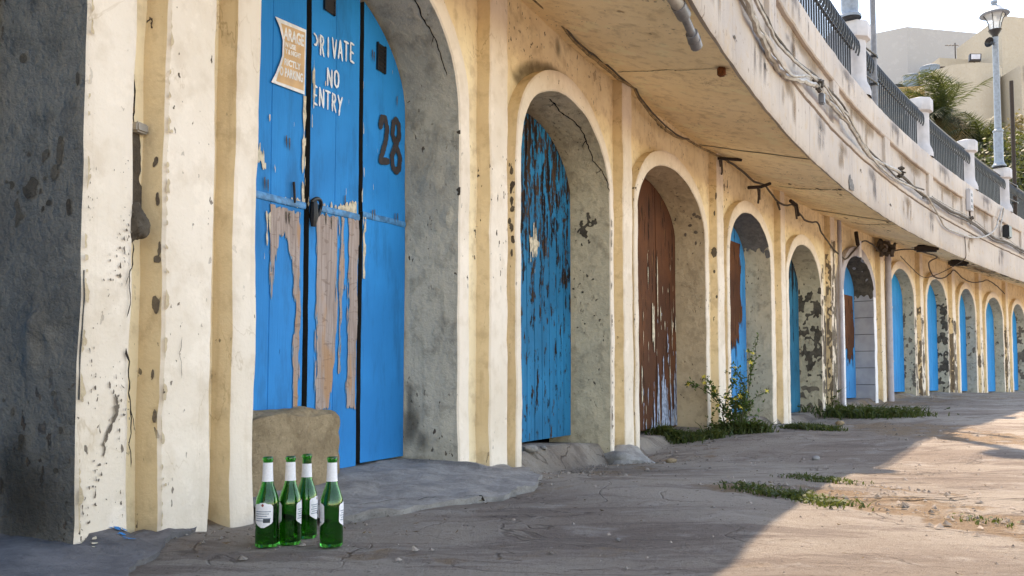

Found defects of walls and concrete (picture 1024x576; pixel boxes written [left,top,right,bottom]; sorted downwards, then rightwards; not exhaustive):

crack [414,0,447,74]
crack [549,99,609,189]
peeling [264,68,326,408]
peeling [530,224,539,257]
peeling [798,241,874,411]
peeling [903,294,1024,396]